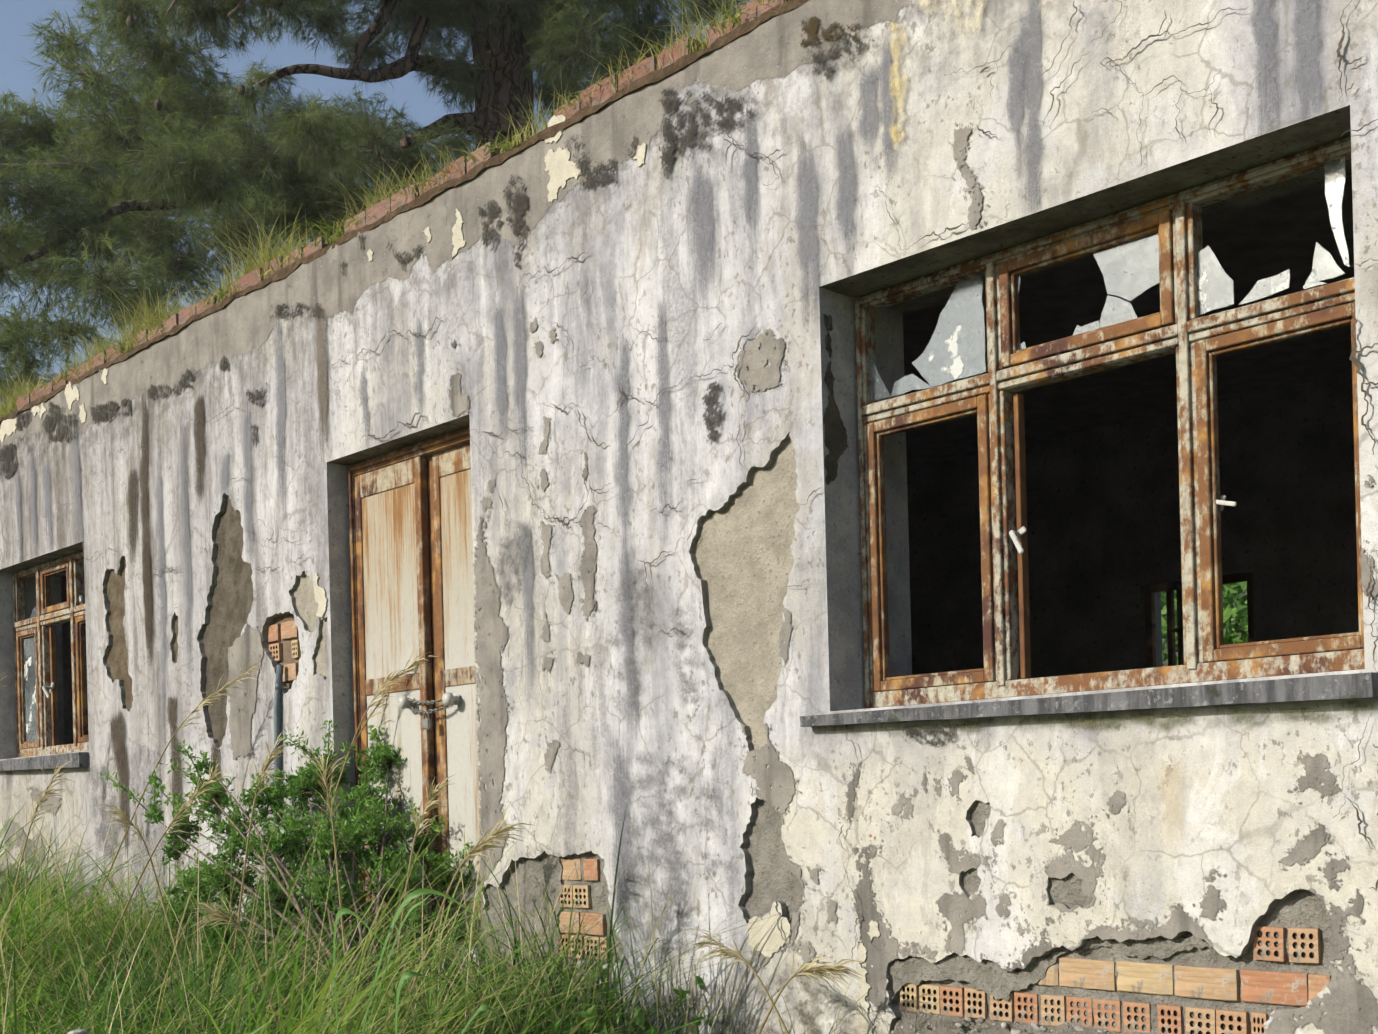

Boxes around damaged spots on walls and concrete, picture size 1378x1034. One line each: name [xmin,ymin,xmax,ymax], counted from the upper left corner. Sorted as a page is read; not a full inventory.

peeling [0,0,910,449]
water stain [659,88,757,297]
water stain [800,16,906,241]
crack [945,0,1249,163]
crack [1336,0,1378,137]
water stain [702,381,722,444]
water stain [0,302,328,934]
spalling [202,495,329,760]
spalling [470,452,624,1031]
spalling [694,439,1378,1034]
crack [1333,714,1378,891]
crack [1366,550,1378,672]